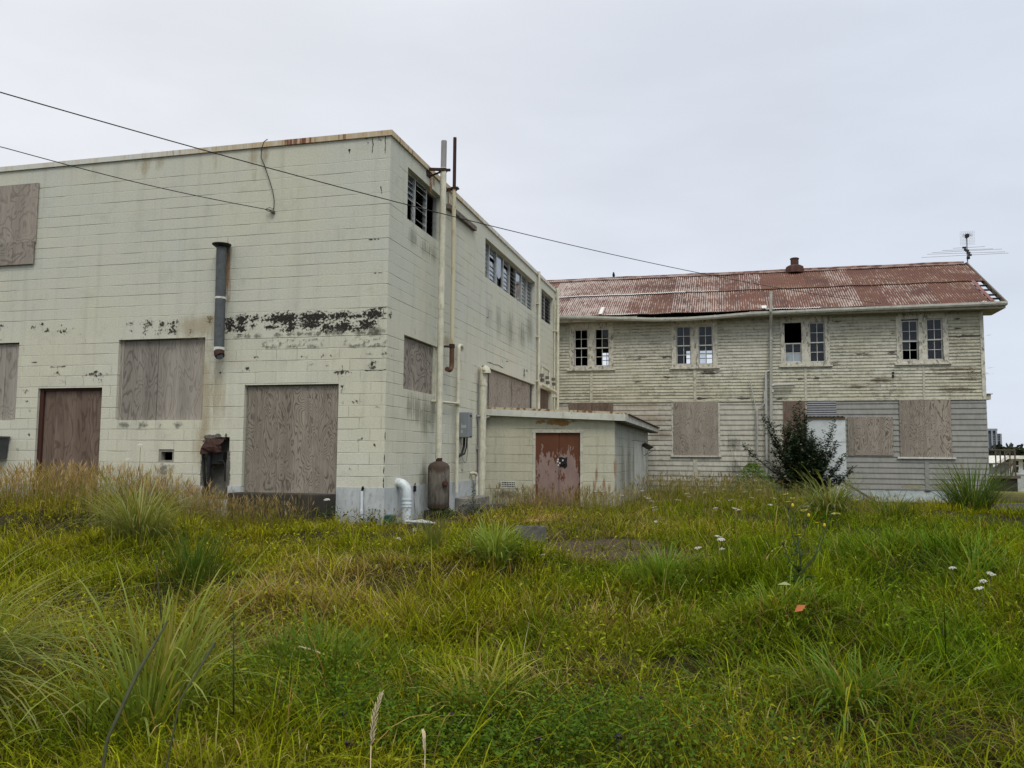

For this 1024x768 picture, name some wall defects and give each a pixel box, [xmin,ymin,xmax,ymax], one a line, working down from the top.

peeling [225,308,386,335]